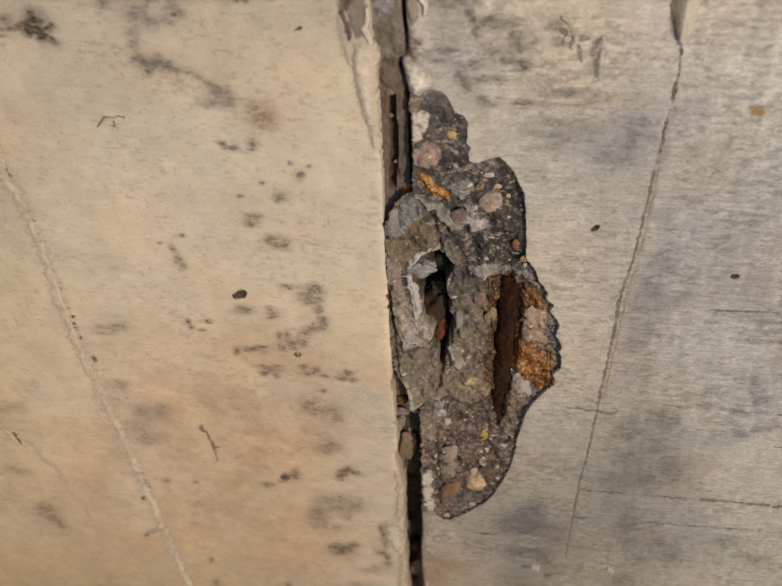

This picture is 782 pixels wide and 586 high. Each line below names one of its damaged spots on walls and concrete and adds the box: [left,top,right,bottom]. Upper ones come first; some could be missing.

mould [0,11,55,42]
leakage [135,57,188,73]
leakage [338,6,378,147]
crack [659,42,683,152]
spalling [384,89,562,520]
corrosion [485,274,555,417]
crack [565,170,661,558]
crack [701,500,782,508]